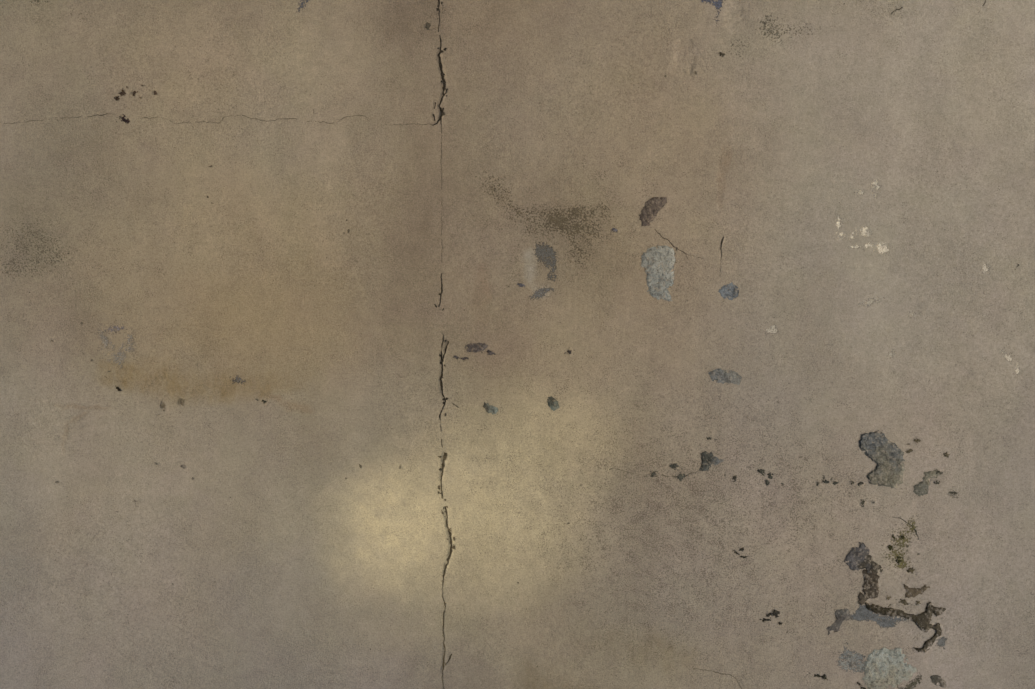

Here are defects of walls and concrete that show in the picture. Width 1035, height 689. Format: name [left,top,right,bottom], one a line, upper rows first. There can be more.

spalling [639,197,667,226]
peeling [516,242,557,300]
spalling [641,244,676,301]
spalling [718,282,740,300]
crack [144,0,459,683]
spalling [453,343,495,362]
spalling [708,368,742,385]
spalling [816,431,957,498]
spalling [826,534,947,689]